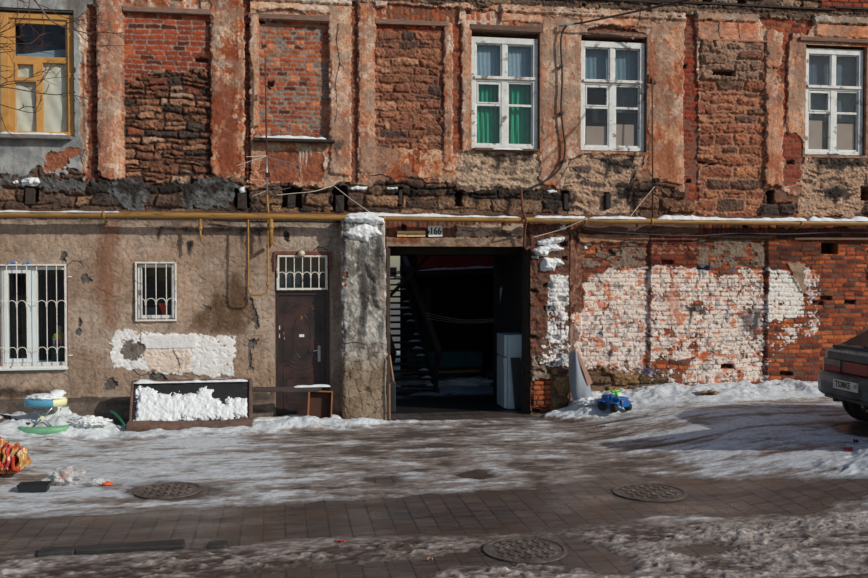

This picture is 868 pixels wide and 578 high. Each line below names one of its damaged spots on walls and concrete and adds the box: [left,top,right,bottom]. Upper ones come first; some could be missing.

spalling [43,5,99,185]
spalling [564,153,645,216]
leakage [195,274,255,332]
peeling [540,265,821,385]